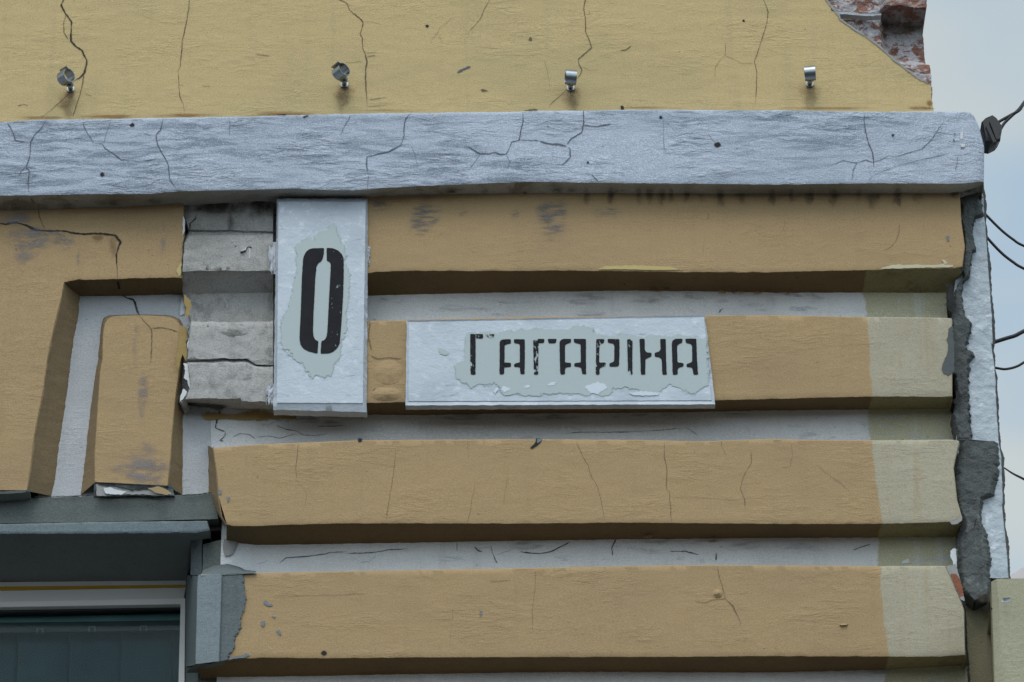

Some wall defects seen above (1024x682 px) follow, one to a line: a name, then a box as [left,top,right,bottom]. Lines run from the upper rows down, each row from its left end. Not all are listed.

crack [550,0,592,105]
crack [715,1,768,102]
spalling [826,0,932,93]
crack [366,114,417,190]
crack [467,110,610,168]
crack [831,115,968,178]
crack [0,0,344,476]
crack [573,428,692,517]
crack [671,551,740,620]
spalling [947,548,965,601]